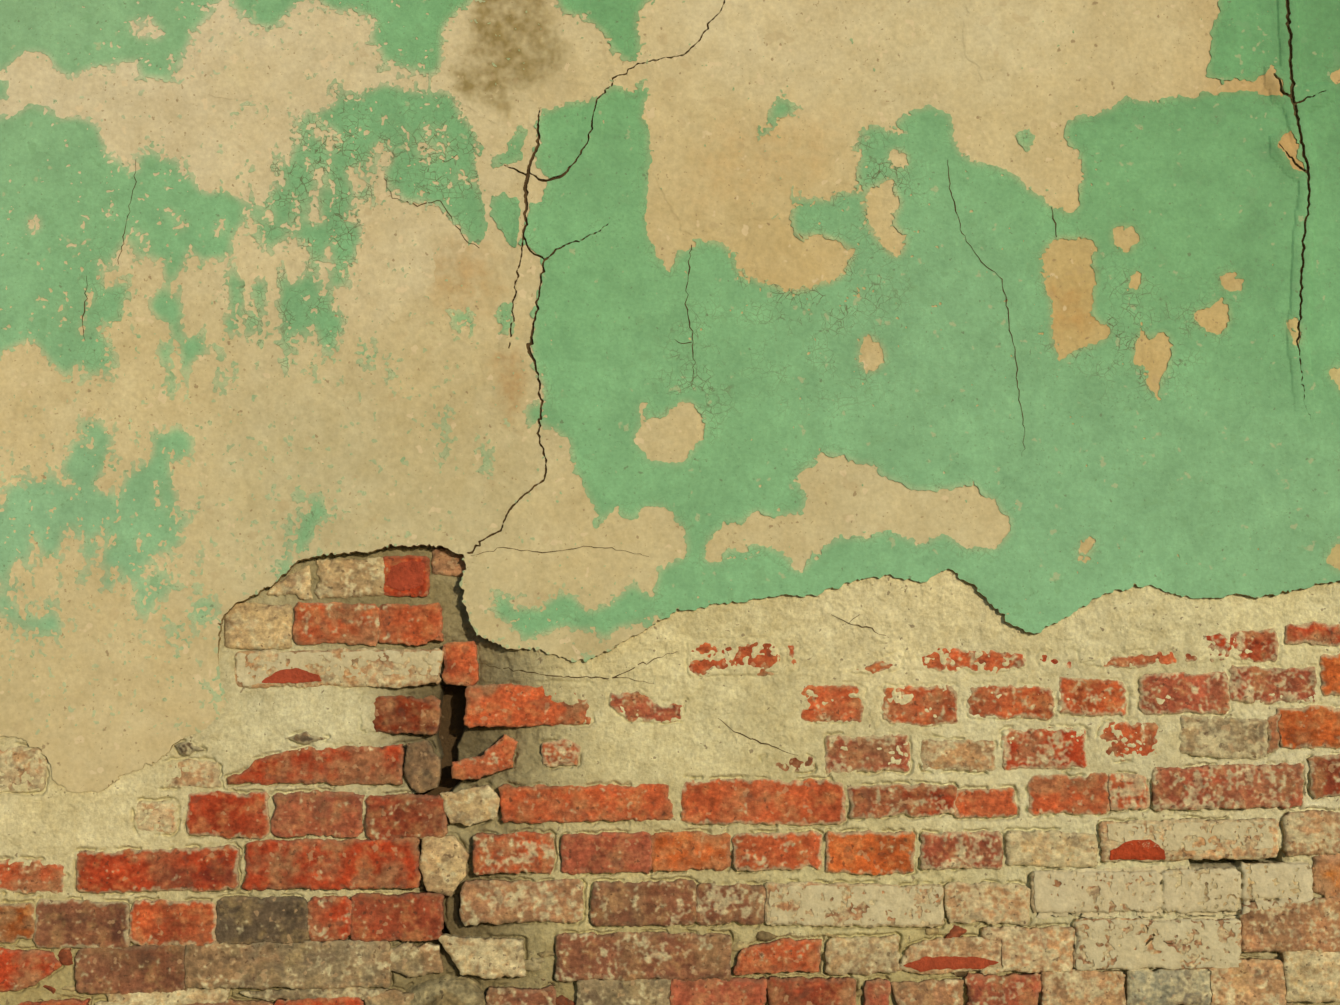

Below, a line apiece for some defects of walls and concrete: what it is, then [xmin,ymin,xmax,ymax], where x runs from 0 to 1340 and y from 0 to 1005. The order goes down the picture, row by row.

peeling [0,0,475,206]
crack [384,0,725,557]
peeling [328,0,1340,689]
crack [947,161,1025,451]
crack [1273,0,1326,419]
peeling [0,214,456,855]
crack [362,690,460,793]
crack [420,875,469,936]
peeling [769,885,944,926]
spalling [903,956,999,972]
peeling [1033,821,1313,971]